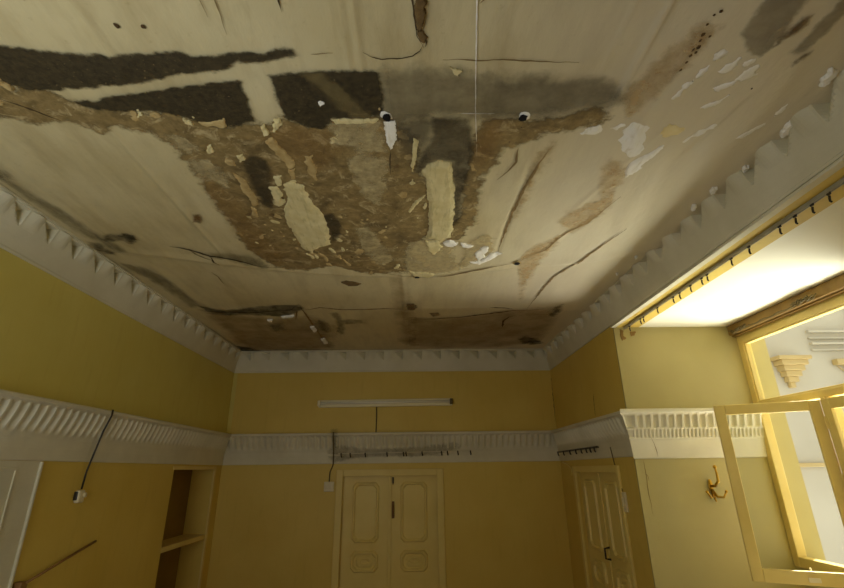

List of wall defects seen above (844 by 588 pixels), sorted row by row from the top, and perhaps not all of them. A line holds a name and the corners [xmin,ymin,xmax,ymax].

crack [364,0,427,60]
leakage [679,10,723,71]
leakage [745,0,810,55]
peeling [671,49,760,109]
spalling [818,67,839,87]
peeling [624,124,717,178]
flaking render [0,79,626,286]
crack [176,145,620,283]
crack [437,230,625,327]
leakage [202,305,302,316]